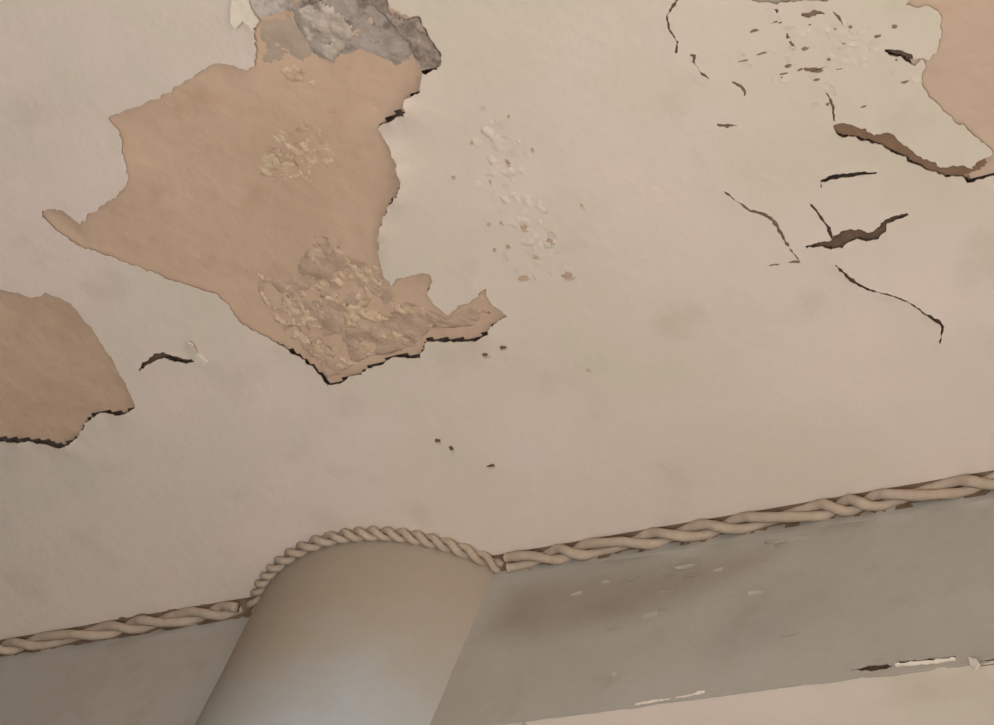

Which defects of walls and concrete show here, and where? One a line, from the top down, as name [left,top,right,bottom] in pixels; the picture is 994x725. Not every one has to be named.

crack [666,0,708,78]
crack [732,7,987,179]
peeling [907,0,994,178]
peeling [43,0,506,384]
crack [725,192,944,342]
peeling [0,289,135,445]
crack [141,342,208,368]